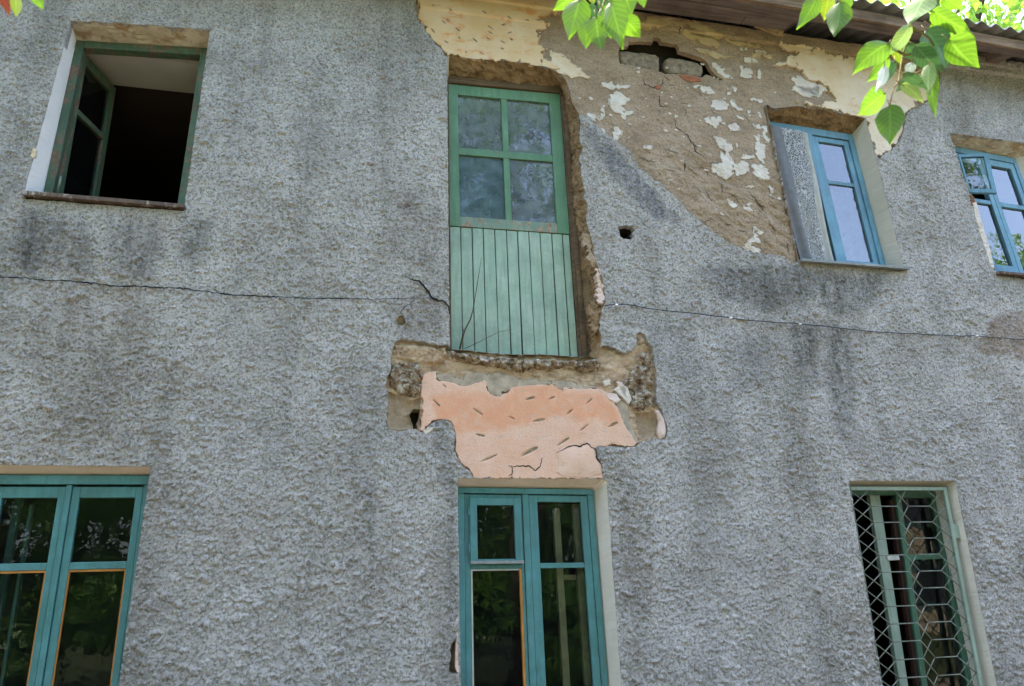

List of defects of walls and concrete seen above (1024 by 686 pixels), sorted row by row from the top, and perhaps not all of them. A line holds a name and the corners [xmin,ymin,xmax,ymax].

flaking render [415,0,928,264]
crack [0,276,450,314]
flaking render [386,333,666,479]